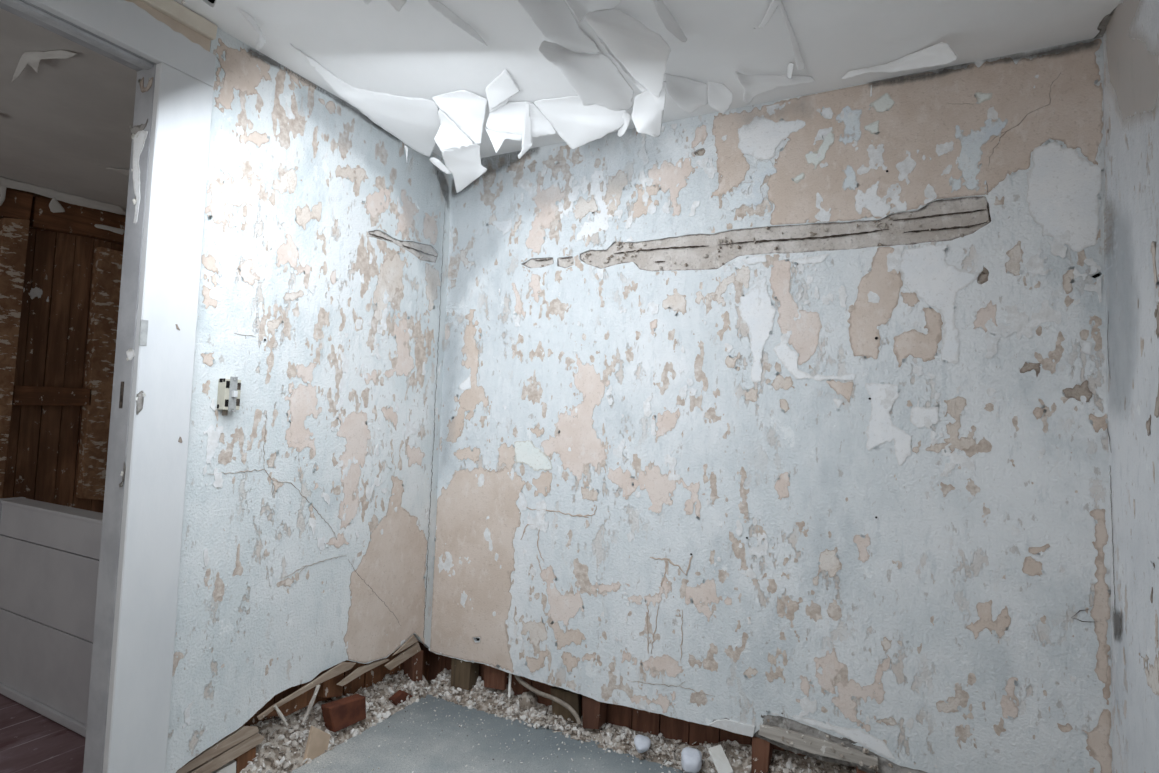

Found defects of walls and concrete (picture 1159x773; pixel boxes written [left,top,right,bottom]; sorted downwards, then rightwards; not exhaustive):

peeling [11,50,77,83]
crack [920,73,1061,210]
peeling [201,0,1125,773]
peeling [1146,384,1159,436]
peeling [1139,587,1159,695]